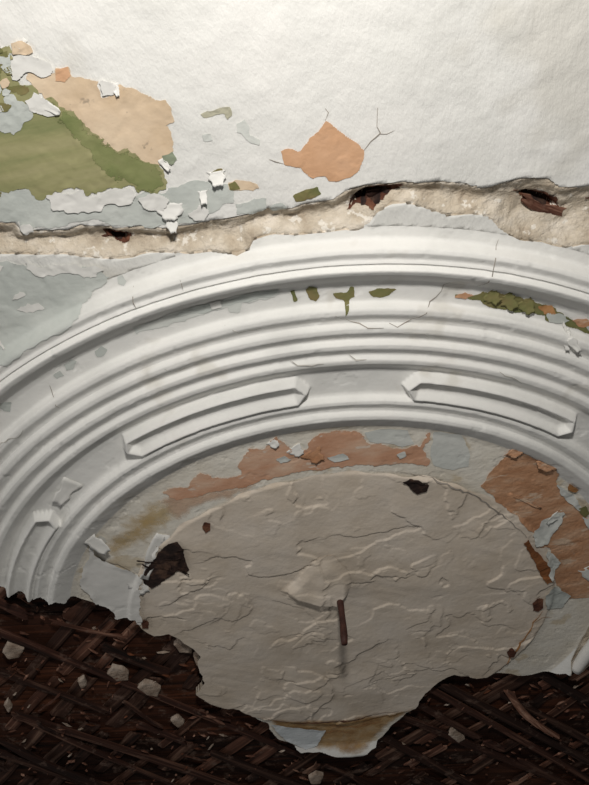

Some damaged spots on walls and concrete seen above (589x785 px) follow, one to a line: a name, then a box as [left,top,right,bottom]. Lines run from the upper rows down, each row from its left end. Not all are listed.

spalling [0,38,589,366]
peeling [163,431,430,516]
peeling [481,449,589,609]
peeling [79,533,189,625]
spalling [571,628,589,672]
peeling [271,725,326,750]
leakage [265,711,403,752]